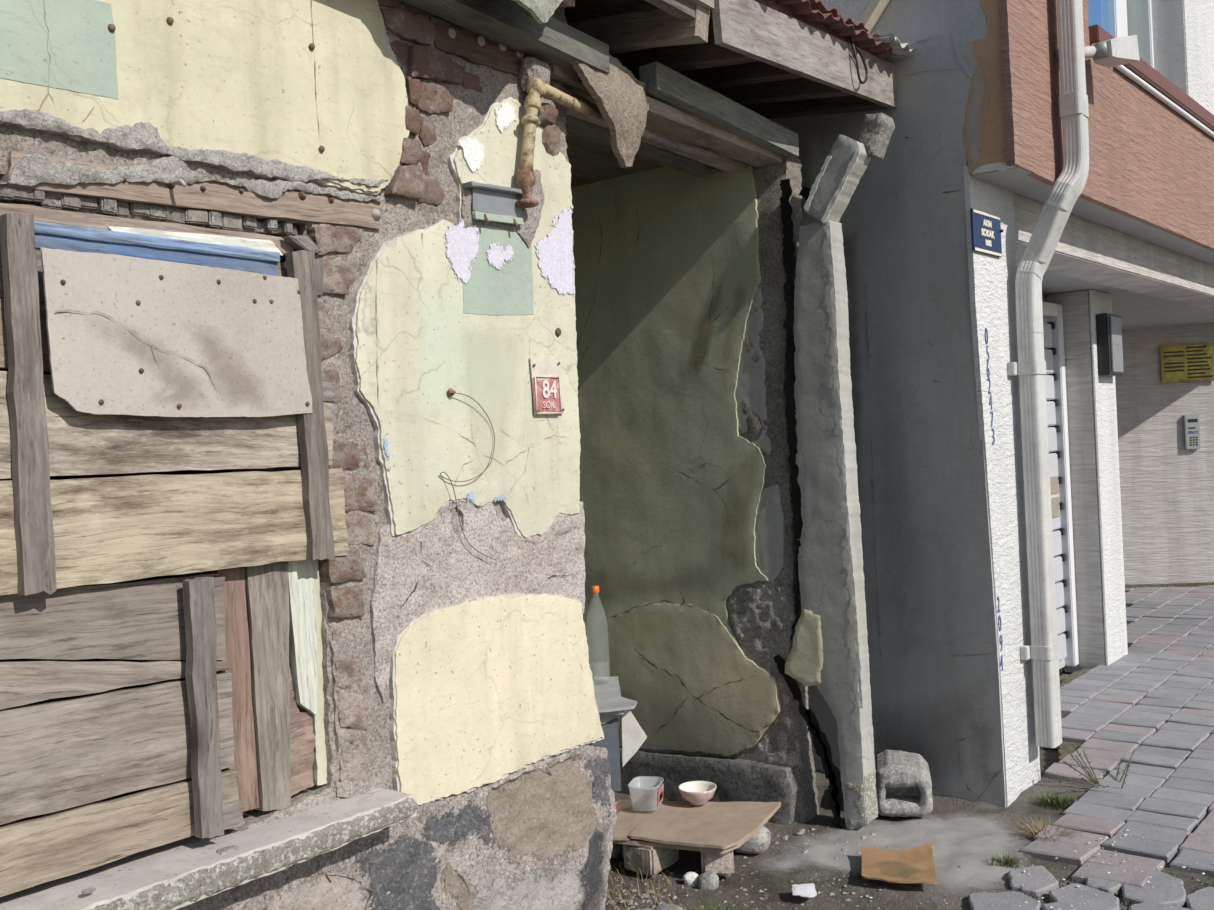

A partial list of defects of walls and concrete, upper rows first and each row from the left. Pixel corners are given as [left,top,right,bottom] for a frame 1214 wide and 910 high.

flaking render [0,0,528,284]
peeling [535,205,575,296]
flaking render [735,285,771,455]
spalling [370,492,586,703]
crack [612,593,723,626]
crack [634,178,843,830]
flaking render [755,484,785,584]
damp [464,839,602,910]